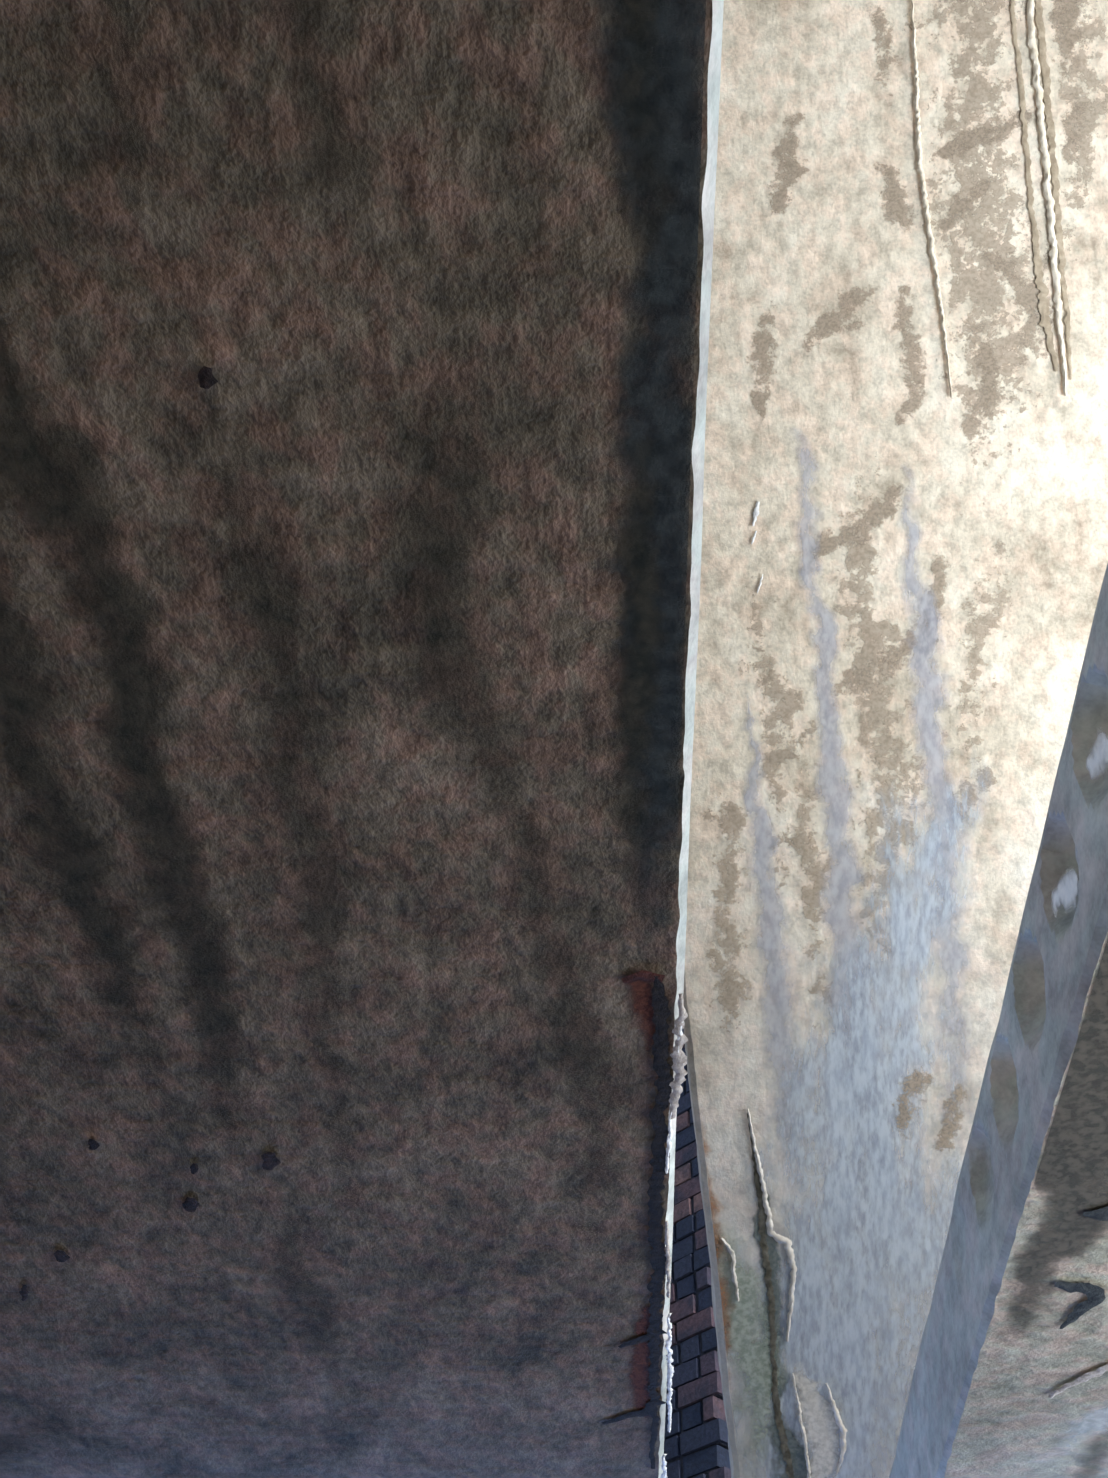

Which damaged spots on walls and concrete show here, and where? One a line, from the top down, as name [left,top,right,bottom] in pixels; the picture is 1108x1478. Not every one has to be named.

water stain [0,387,235,1065]
rust [630,1306,651,1418]
water stain [601,0,706,879]
peeling [792,1372,848,1478]
water stain [734,500,966,1478]
water stain [1009,939,1108,1330]